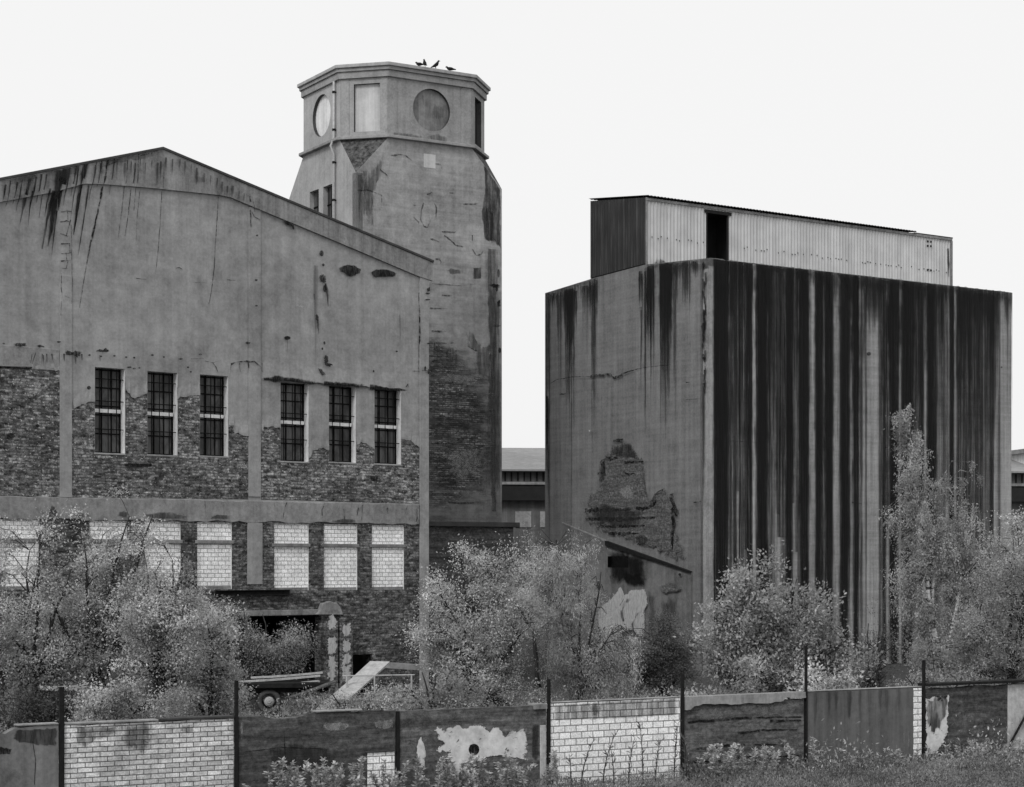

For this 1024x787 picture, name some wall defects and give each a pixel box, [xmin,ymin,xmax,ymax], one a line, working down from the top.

water stain [3,157,234,254]
water stain [482,167,501,246]
spalling [340,265,396,278]
water stain [552,281,597,366]
crack [550,364,689,400]
spalling [0,341,492,507]
spalling [584,439,686,560]
water stain [639,259,1012,665]
peeling [598,587,647,636]
peeling [417,725,527,773]
peeling [926,695,949,756]